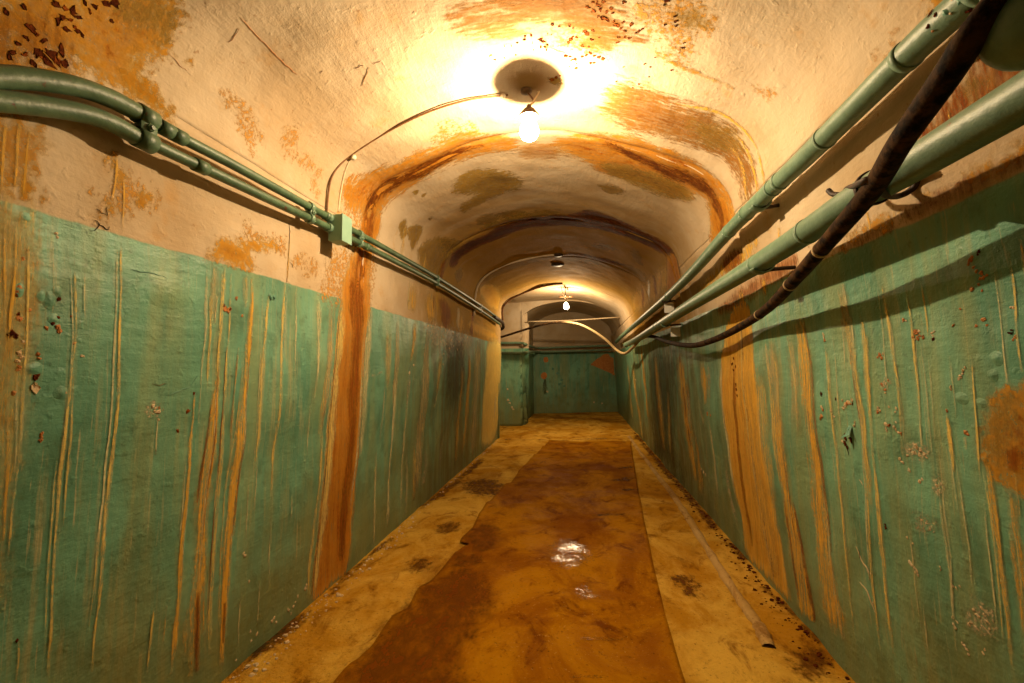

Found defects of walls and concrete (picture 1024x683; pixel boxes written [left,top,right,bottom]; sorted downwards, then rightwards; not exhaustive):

flaking render [7,0,120,70]
flaking render [489,1,643,85]
water stain [451,168,524,226]
peeling [6,308,42,372]
rust [206,77,765,599]
peeling [30,373,41,394]
rust [718,256,844,629]
peeling [876,377,945,495]
rust [978,384,1024,638]
water stain [347,525,496,683]
water stain [548,541,592,567]
water stain [671,575,702,597]